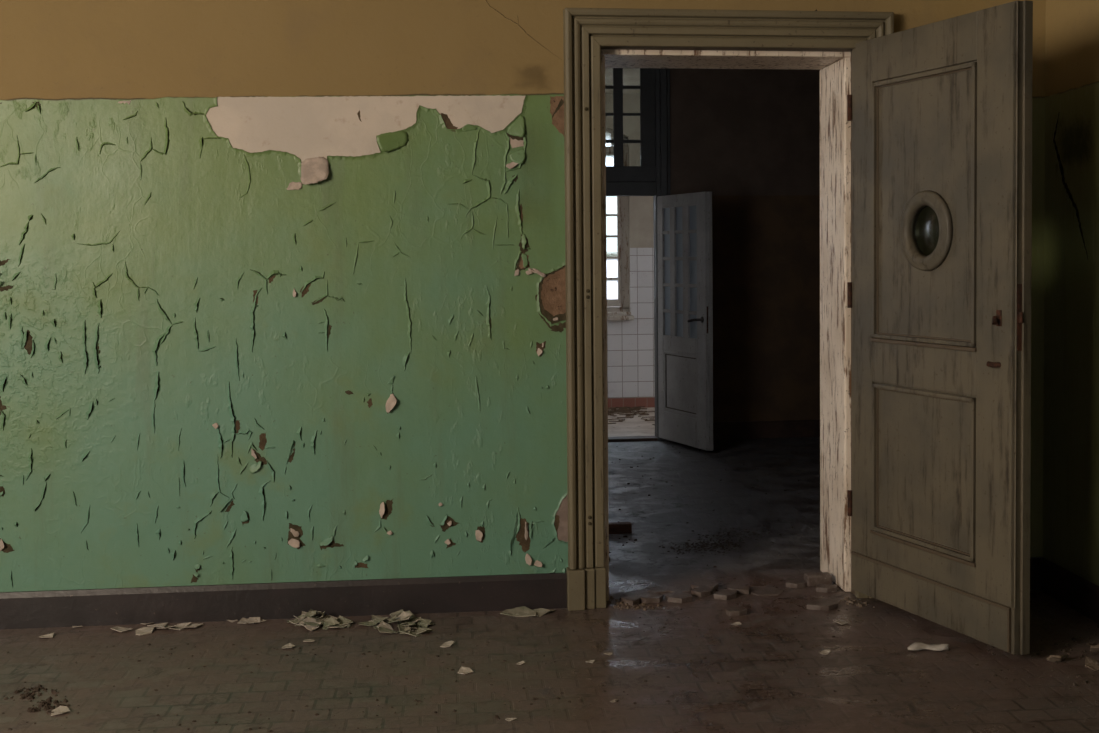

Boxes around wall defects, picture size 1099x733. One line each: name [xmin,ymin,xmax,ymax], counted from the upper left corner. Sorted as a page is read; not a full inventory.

peeling [0,281,36,358]
crack [12,213,46,281]
crack [0,101,221,205]
peeling [203,95,566,365]
crack [345,191,518,381]
crack [426,129,513,250]
crack [22,231,276,581]
peeling [212,381,276,530]
crack [259,460,295,521]
peeling [281,505,344,551]
peeling [426,502,485,558]
flaking render [509,492,568,567]